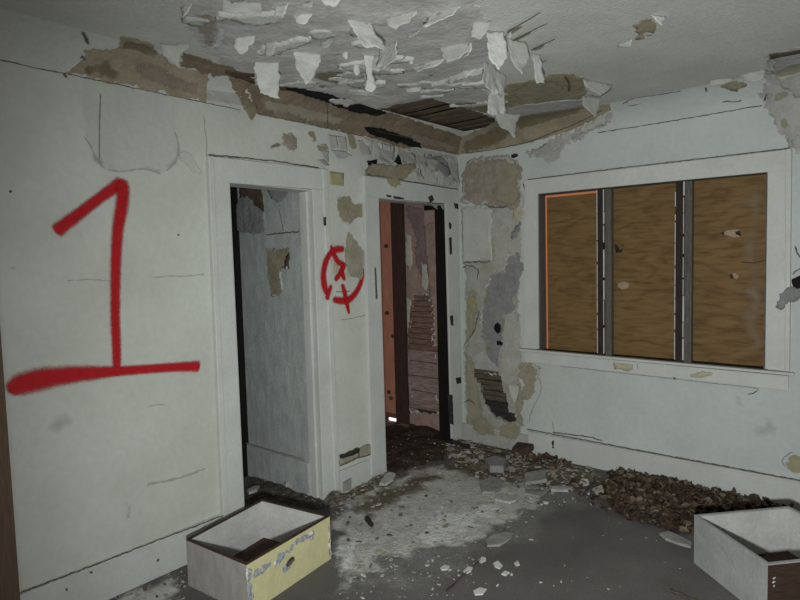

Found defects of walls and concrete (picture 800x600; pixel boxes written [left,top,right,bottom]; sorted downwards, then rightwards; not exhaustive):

flaking render [617,15,666,48]
peeling [709,47,800,154]
peeling [63,0,613,439]
flaking render [776,269,800,310]